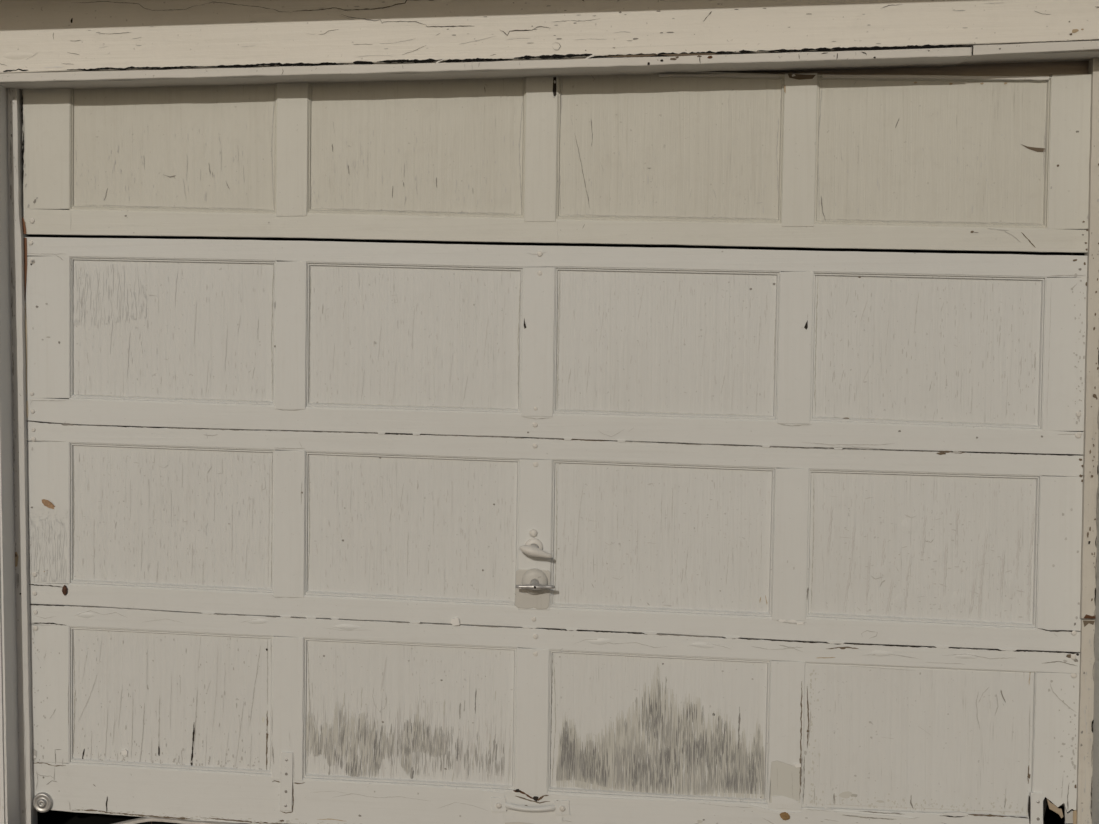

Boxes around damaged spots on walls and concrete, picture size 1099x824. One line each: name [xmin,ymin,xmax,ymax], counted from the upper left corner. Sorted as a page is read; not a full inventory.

crack [1,0,1099,92]